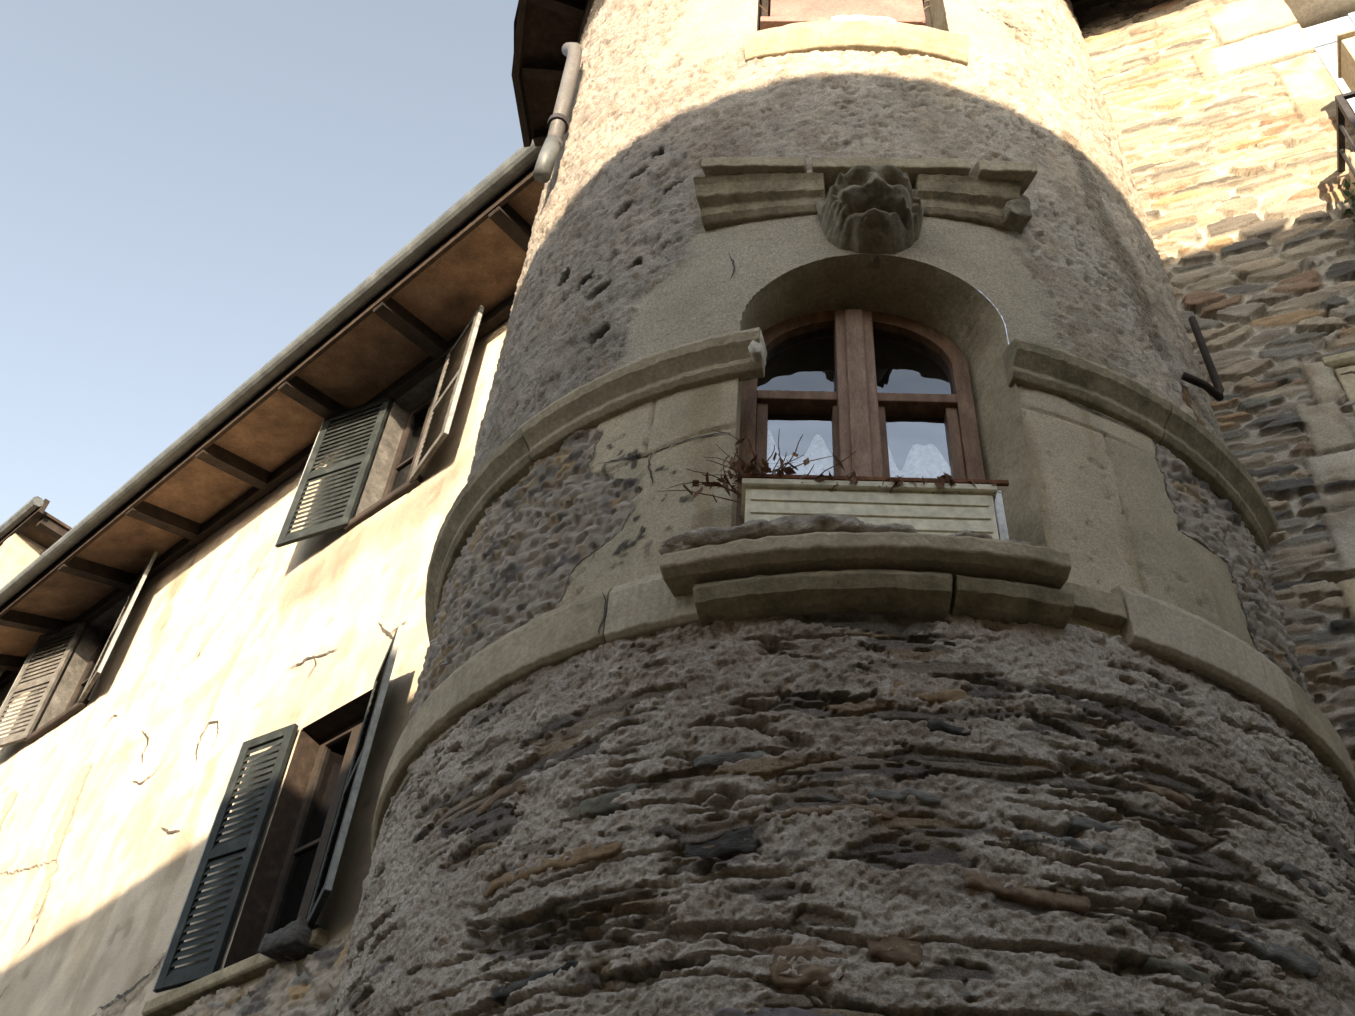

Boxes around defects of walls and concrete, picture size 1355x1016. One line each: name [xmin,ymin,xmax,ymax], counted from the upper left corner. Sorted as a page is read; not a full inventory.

crack [287,649,336,678]
crack [105,714,219,784]